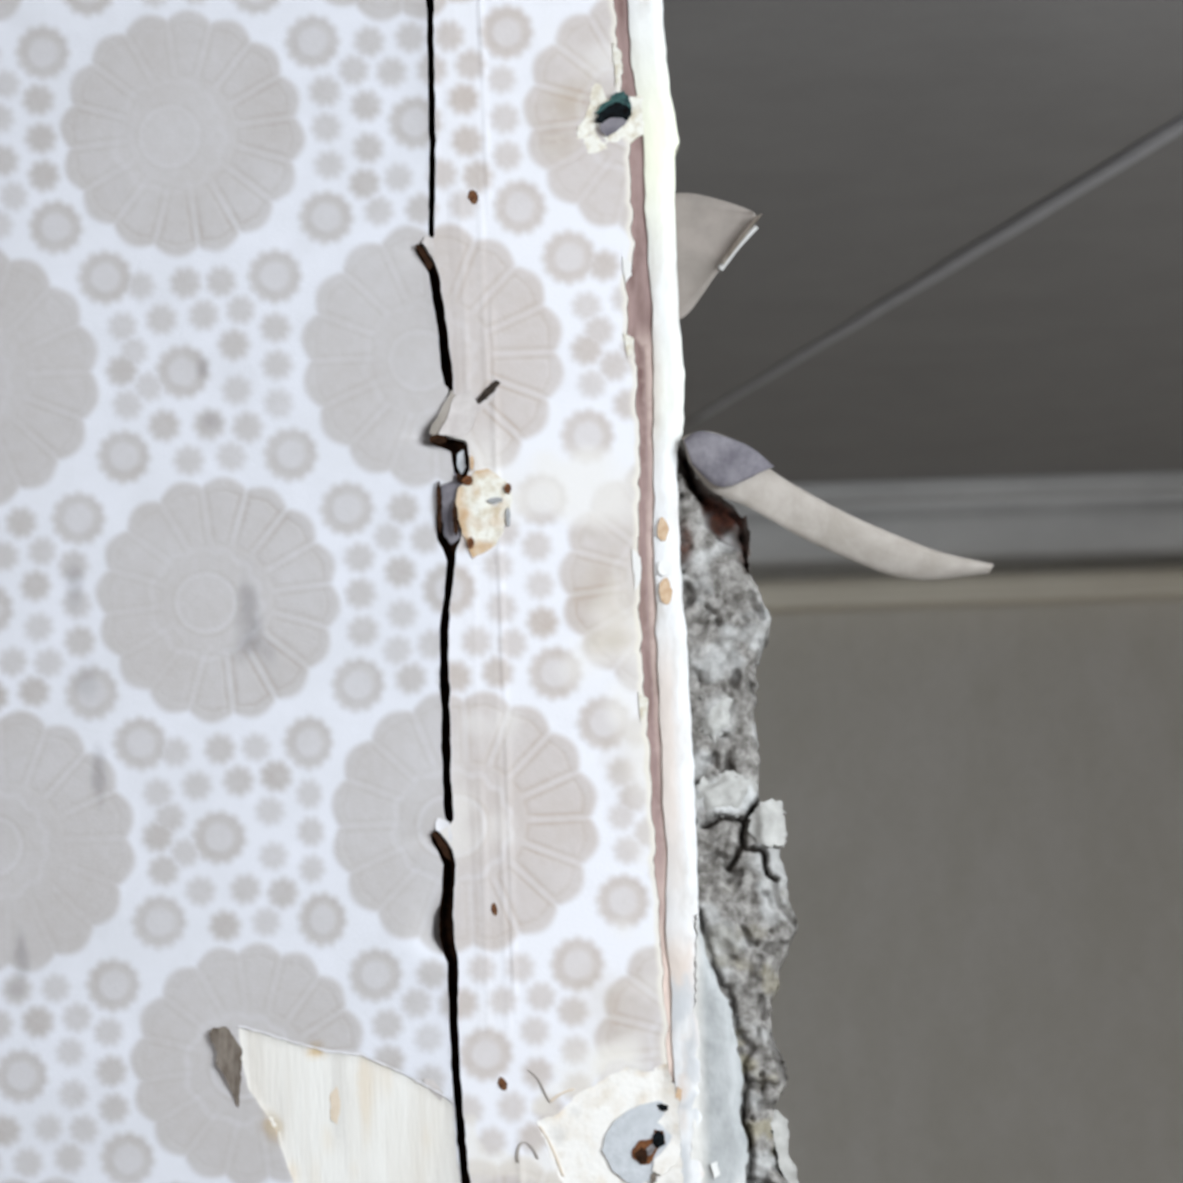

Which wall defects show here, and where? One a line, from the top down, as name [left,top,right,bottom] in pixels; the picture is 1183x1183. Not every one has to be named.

crack [415,0,501,414]
peeling [613,0,637,97]
crack [430,433,470,1183]
spalling [429,390,478,445]
spalling [436,450,512,558]
spalling [622,135,799,1183]